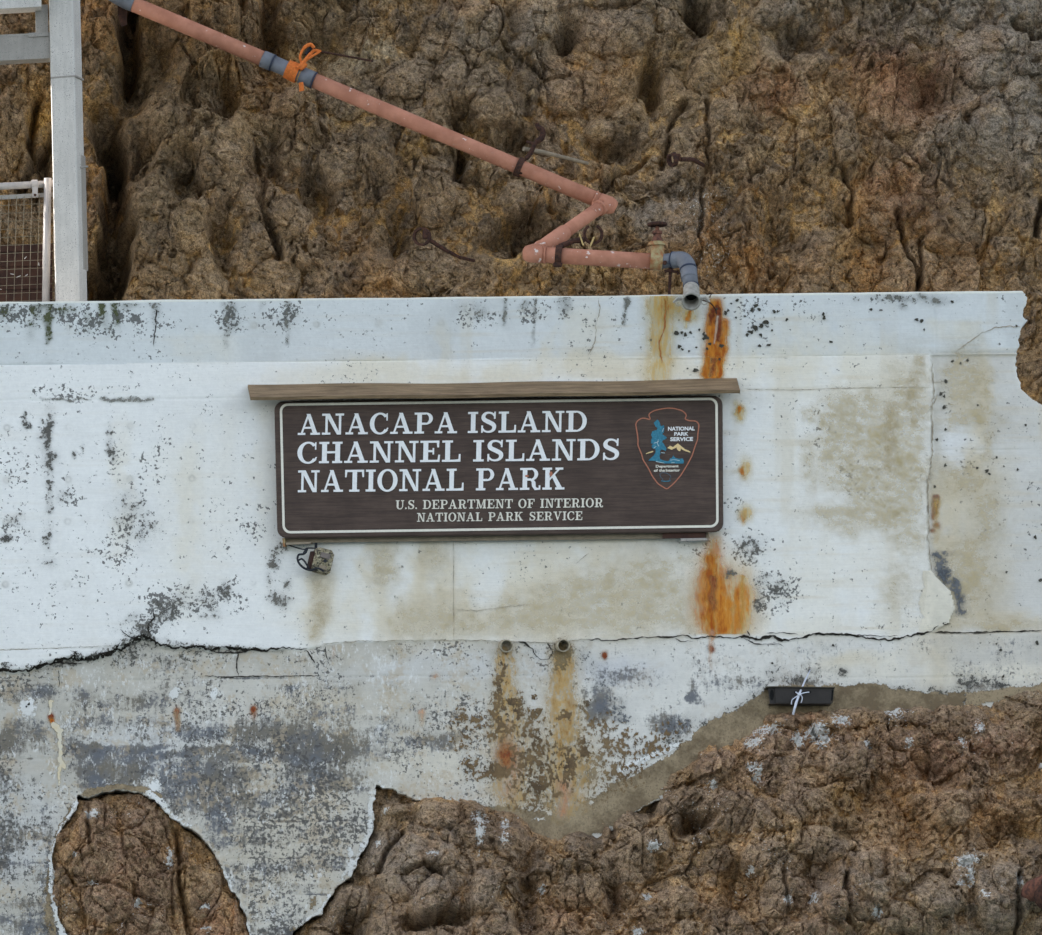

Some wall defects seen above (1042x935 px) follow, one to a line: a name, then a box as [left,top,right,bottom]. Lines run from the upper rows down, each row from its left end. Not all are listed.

rust [650,296,729,380]
leakage [885,295,945,307]
crack [0,541,1042,688]
rust [694,538,752,652]
rust [493,646,532,809]
rust [545,641,591,818]
peeling [446,650,1042,841]
peeling [43,784,192,935]
spalling [290,894,331,931]
spalling [339,795,375,881]